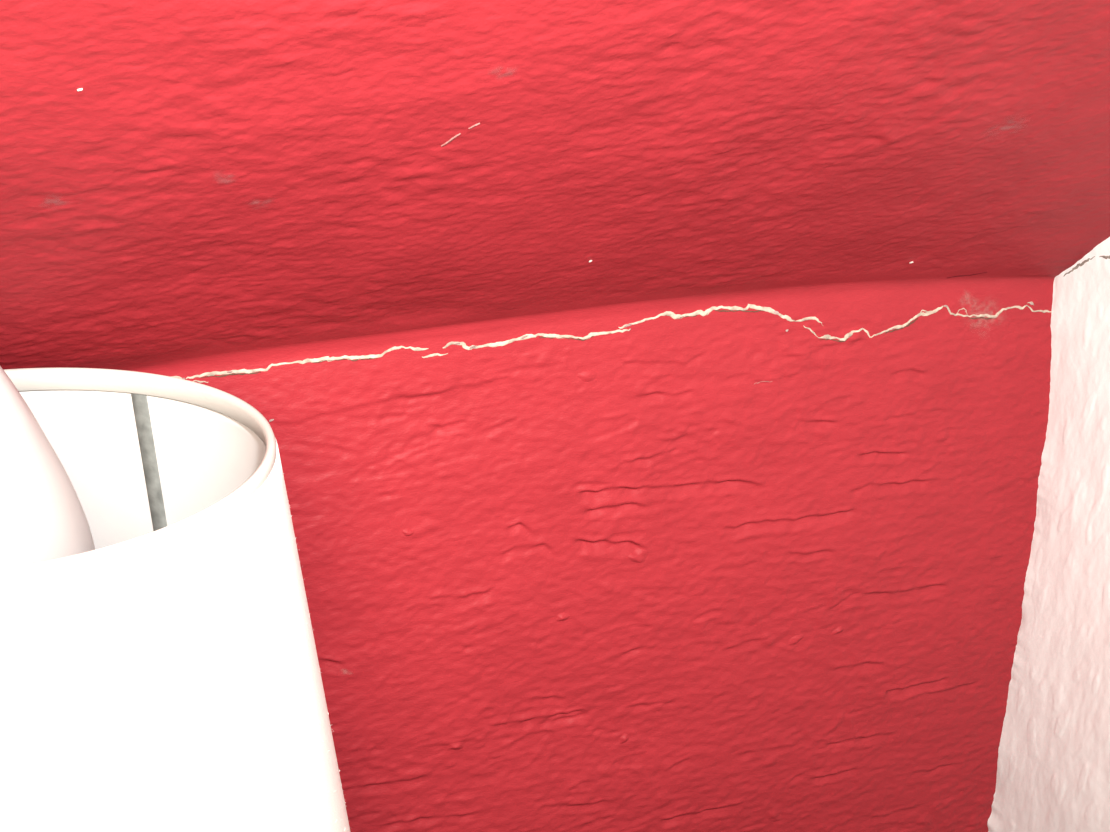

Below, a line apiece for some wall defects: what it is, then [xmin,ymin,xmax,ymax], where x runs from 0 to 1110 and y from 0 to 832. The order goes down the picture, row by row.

crack [170,302,1051,383]